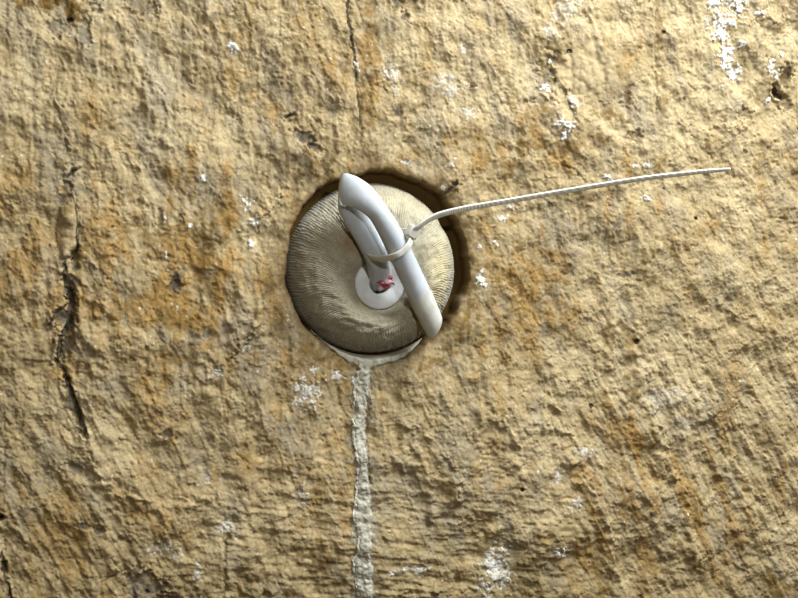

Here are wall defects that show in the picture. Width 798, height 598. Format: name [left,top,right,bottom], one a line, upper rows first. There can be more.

crack [346,0,362,134]
leakage [705,0,747,87]
crack [48,168,87,434]
leakage [292,361,379,598]
crack [1,550,12,598]